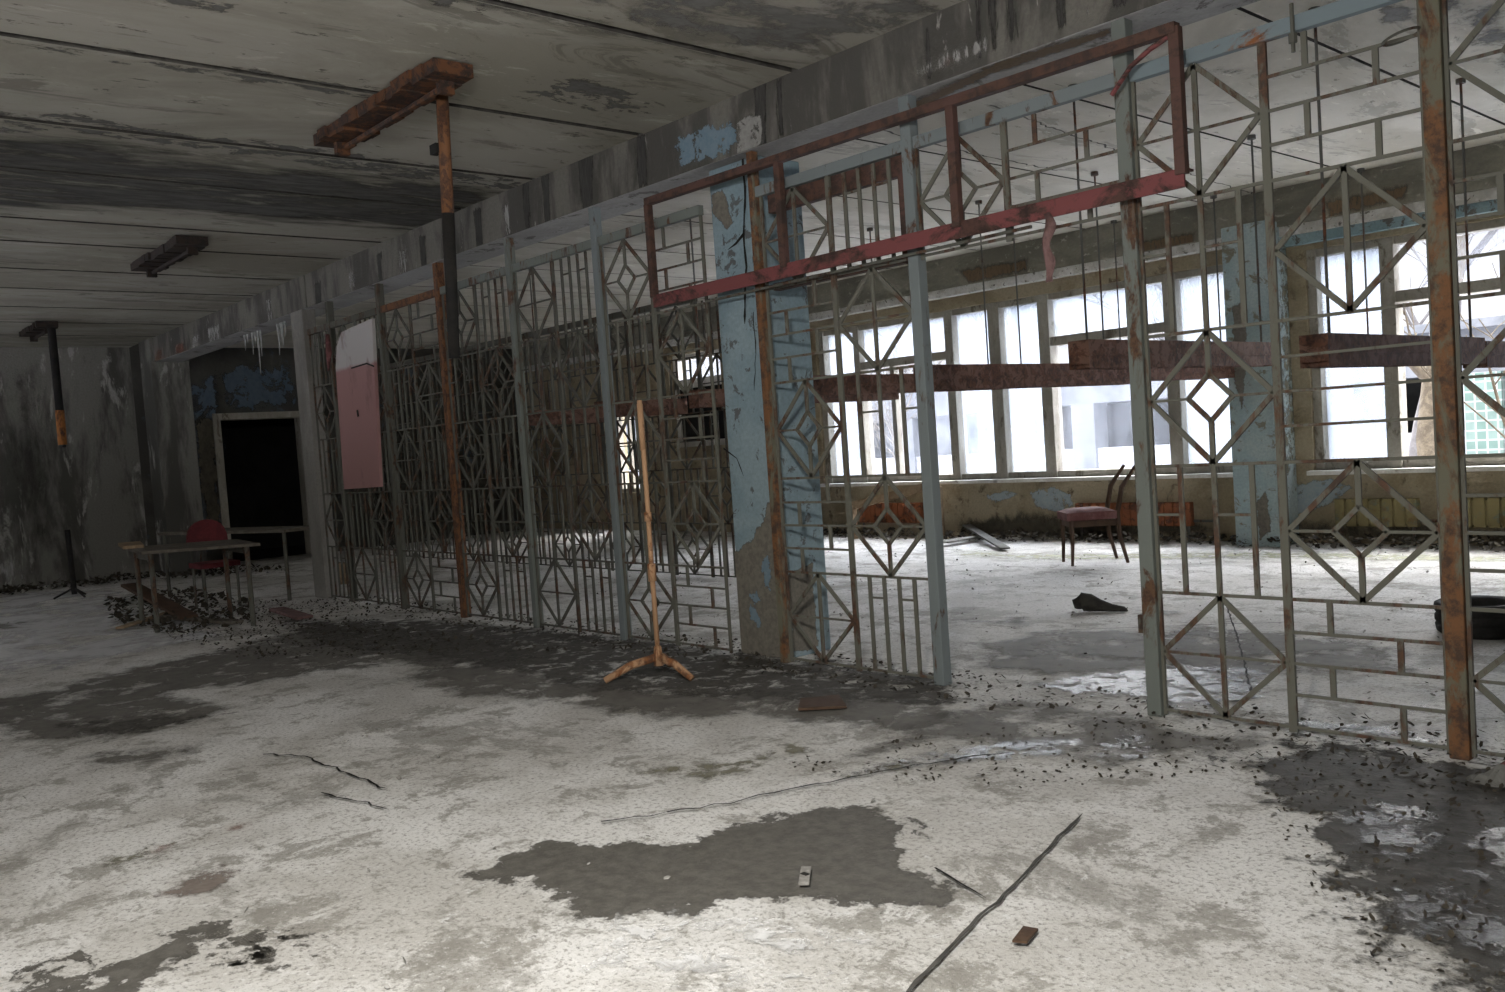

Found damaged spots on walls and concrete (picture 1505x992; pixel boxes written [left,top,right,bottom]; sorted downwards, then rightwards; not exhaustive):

leakage [629,0,1019,79]
leakage [1056,0,1066,29]
peeling [675,115,763,167]
leakage [754,78,783,145]
leakage [0,628,952,739]
leakage [94,748,195,763]
leakage [462,805,968,920]
crack [906,813,1083,992]
leakage [9,916,328,992]